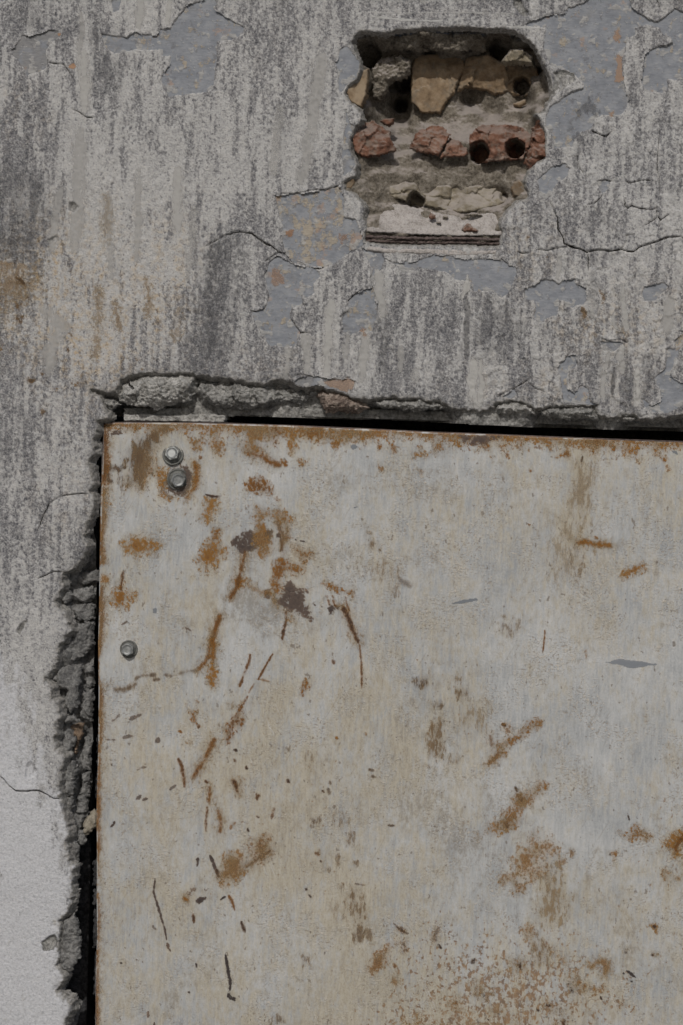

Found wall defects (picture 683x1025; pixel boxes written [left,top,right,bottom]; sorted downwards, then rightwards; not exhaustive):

peeling [102,0,244,97]
crack [212,232,324,269]
spalling [273,0,683,336]
crack [519,140,681,271]
flaking render [104,333,683,432]
corrosion [99,423,682,689]
flaking render [41,525,99,1025]
corrosion [425,704,446,761]
corrosion [488,783,550,837]
corrosion [662,829,683,859]
corrosion [341,883,396,975]
corrosion [498,830,574,966]